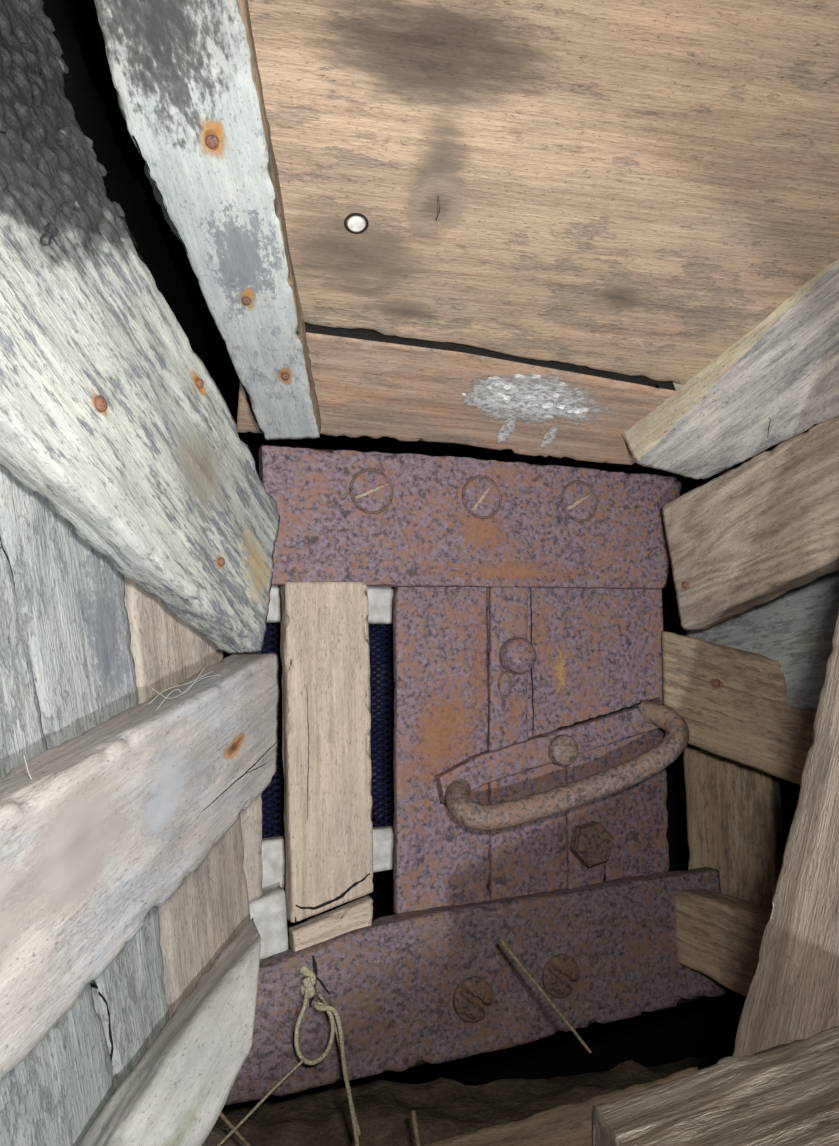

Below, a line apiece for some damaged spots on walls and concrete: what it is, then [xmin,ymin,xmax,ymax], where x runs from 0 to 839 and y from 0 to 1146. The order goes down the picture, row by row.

corrosion [201,122,223,156]
corrosion [278,368,292,384]
corrosion [551,644,569,706]
corrosion [224,733,245,759]